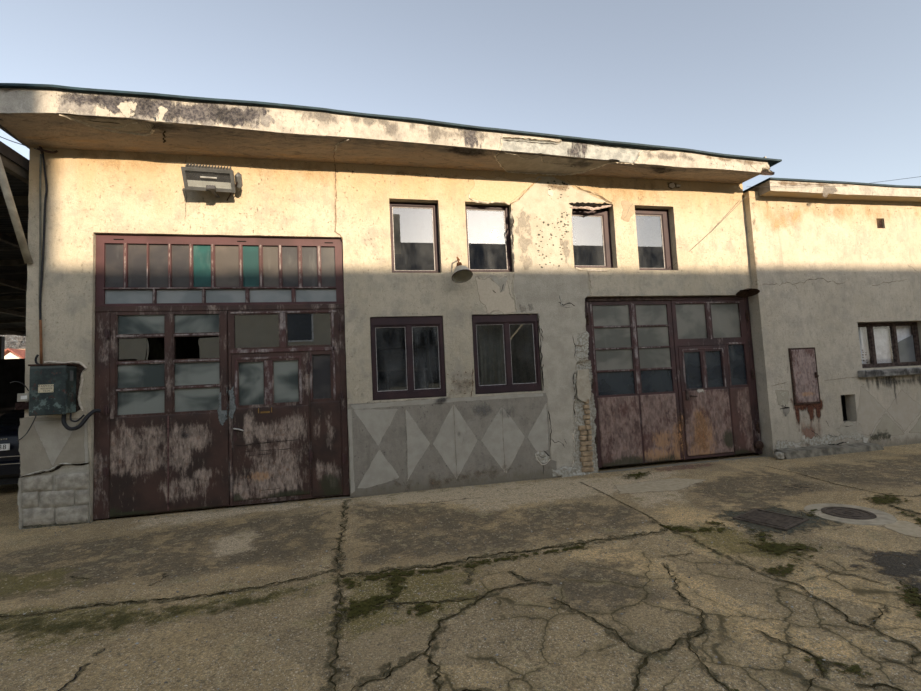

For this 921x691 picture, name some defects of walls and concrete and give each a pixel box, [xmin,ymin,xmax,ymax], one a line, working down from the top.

leakage [57,92,275,130]
crack [333,138,349,239]
peeling [468,136,657,477]
leakage [865,369,921,396]
rust [791,399,823,439]